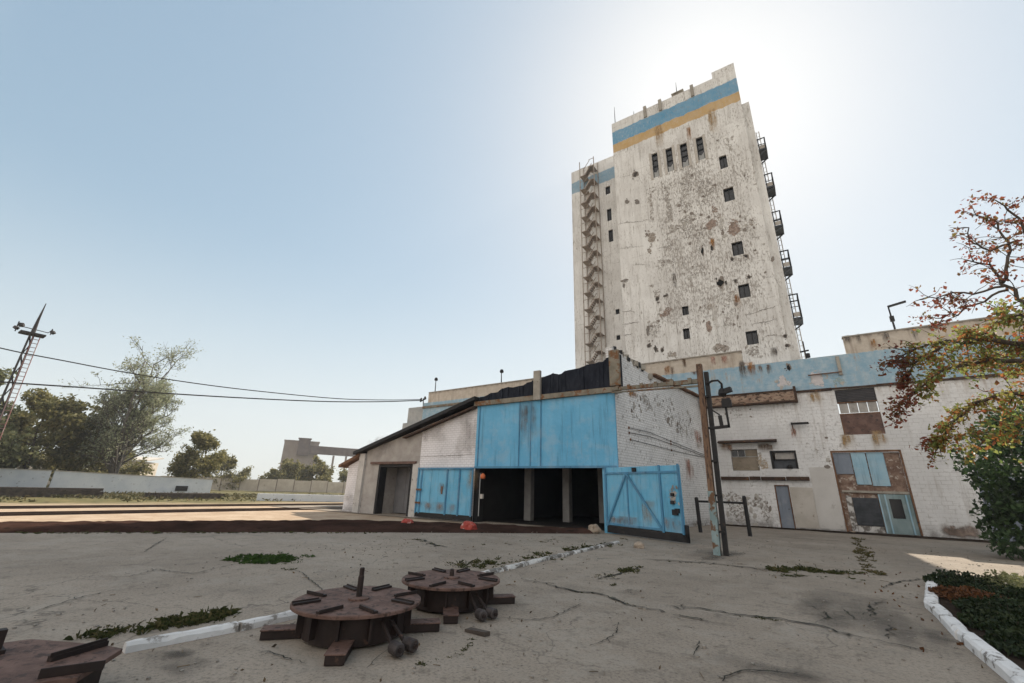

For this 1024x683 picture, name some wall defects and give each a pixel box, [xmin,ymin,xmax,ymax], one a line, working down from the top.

peeling [625,172,757,332]
peeling [646,285,678,359]
peeling [774,363,792,390]
peeling [631,395,702,448]
peeling [722,492,772,526]